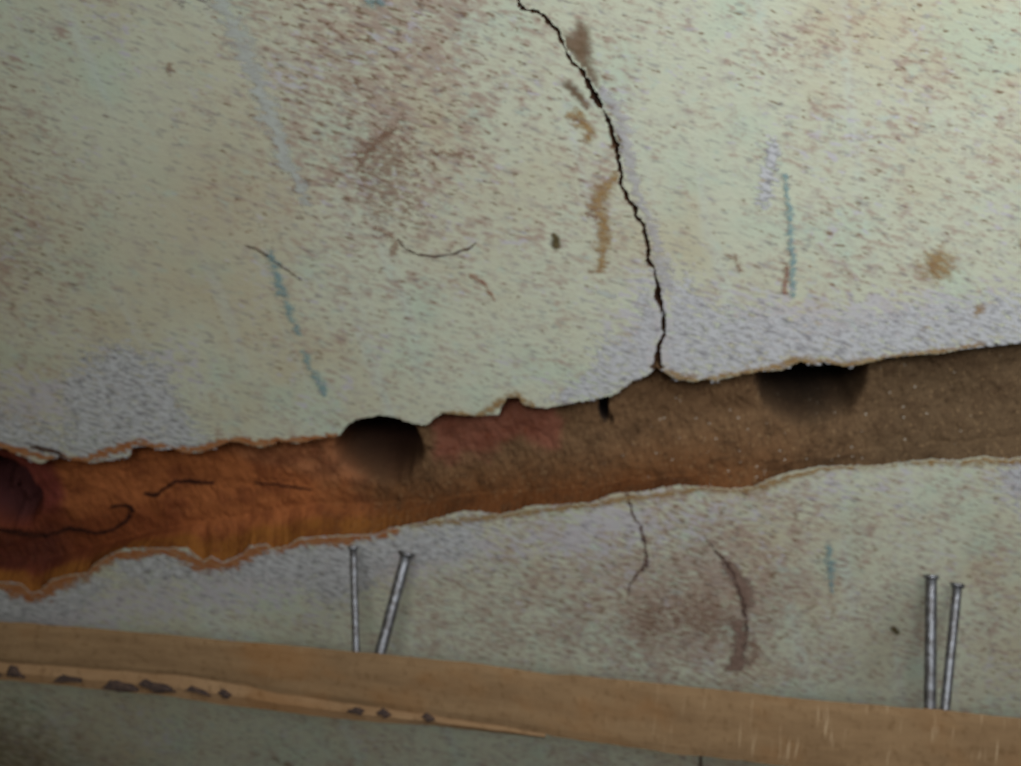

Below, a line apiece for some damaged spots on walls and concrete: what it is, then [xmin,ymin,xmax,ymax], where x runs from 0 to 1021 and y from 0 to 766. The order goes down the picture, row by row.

crack [517,0,675,368]
flaking render [0,397,494,625]
crack [625,493,649,595]